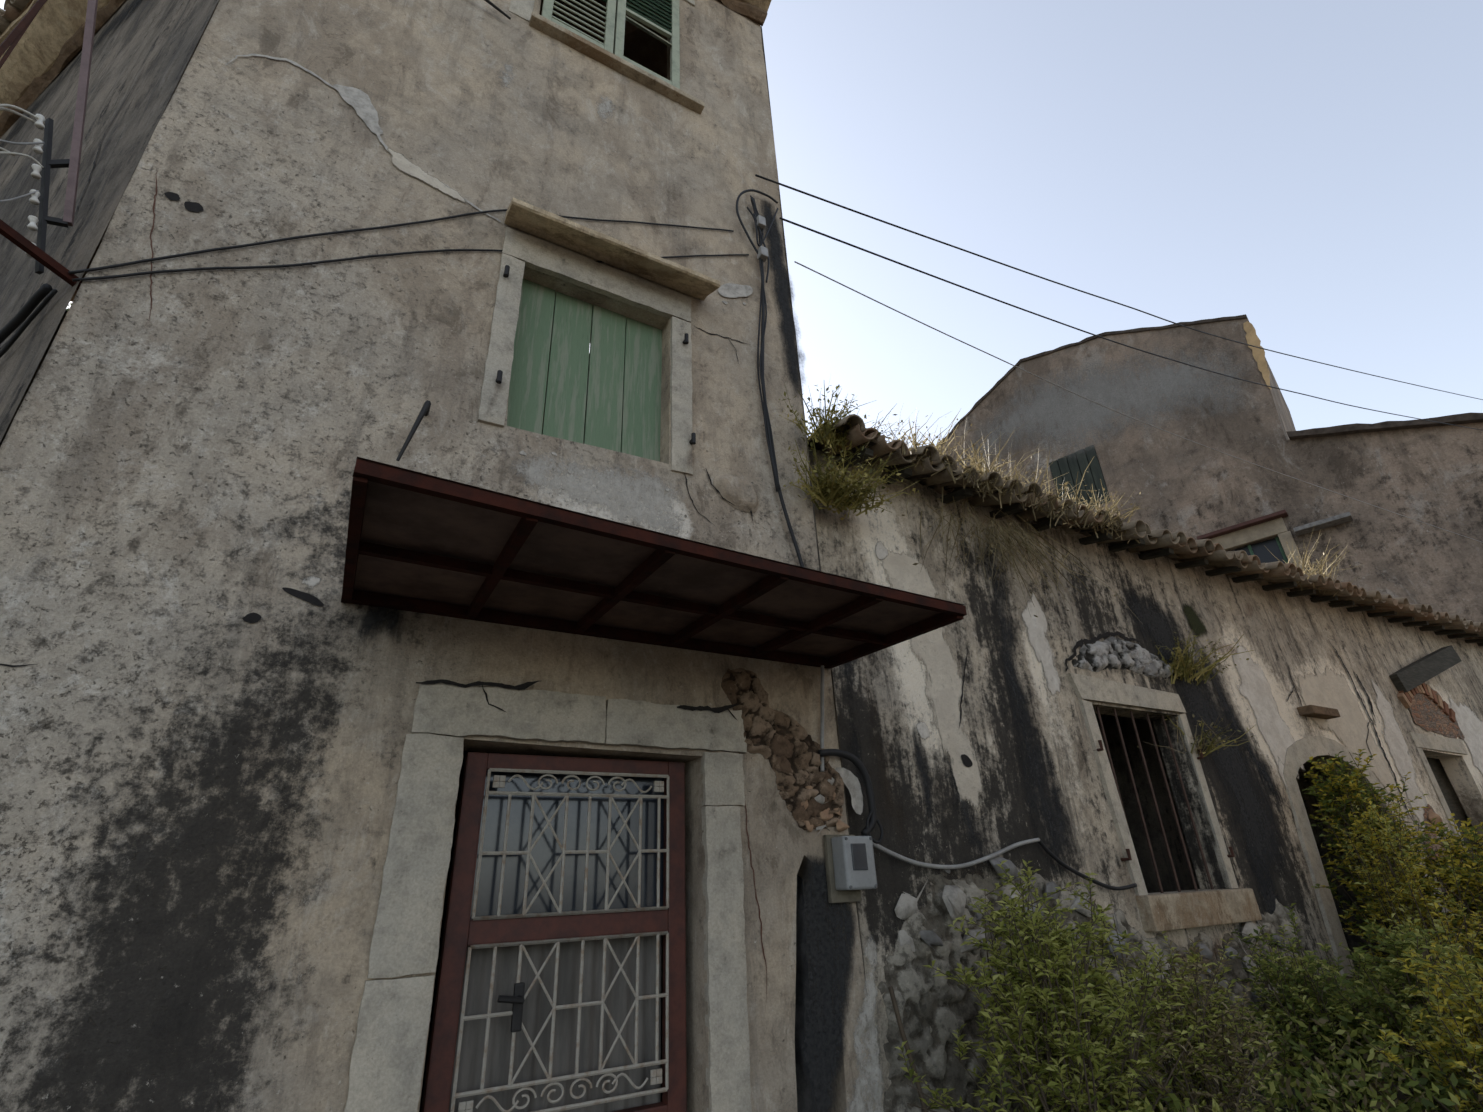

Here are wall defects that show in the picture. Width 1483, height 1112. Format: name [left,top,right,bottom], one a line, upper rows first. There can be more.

crack [0,661,35,669]
crack [416,679,539,712]
flaking render [721,668,863,838]
water stain [913,728,933,820]
water stain [985,547,1078,869]
flaking render [1021,592,1173,695]
water stain [1124,591,1284,914]
peeling [1297,666,1483,871]